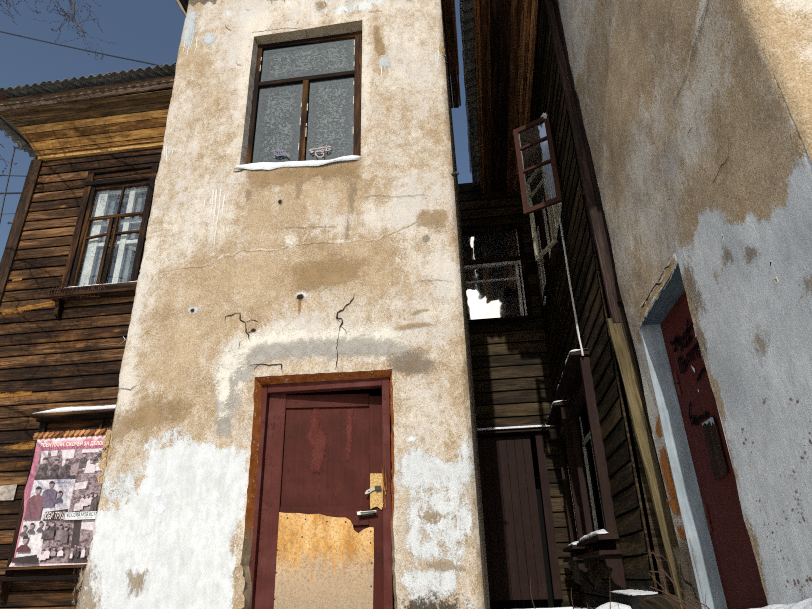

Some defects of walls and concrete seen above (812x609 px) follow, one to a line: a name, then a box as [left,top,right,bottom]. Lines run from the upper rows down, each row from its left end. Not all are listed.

peeling [636,253,707,360]
crack [225,313,258,347]
crack [335,296,354,370]
water stain [212,309,434,419]
spalling [97,430,114,485]
peeling [418,511,445,524]
peeling [73,565,101,609]
peeling [126,569,147,597]
spalling [232,565,245,609]
peeling [427,559,465,571]